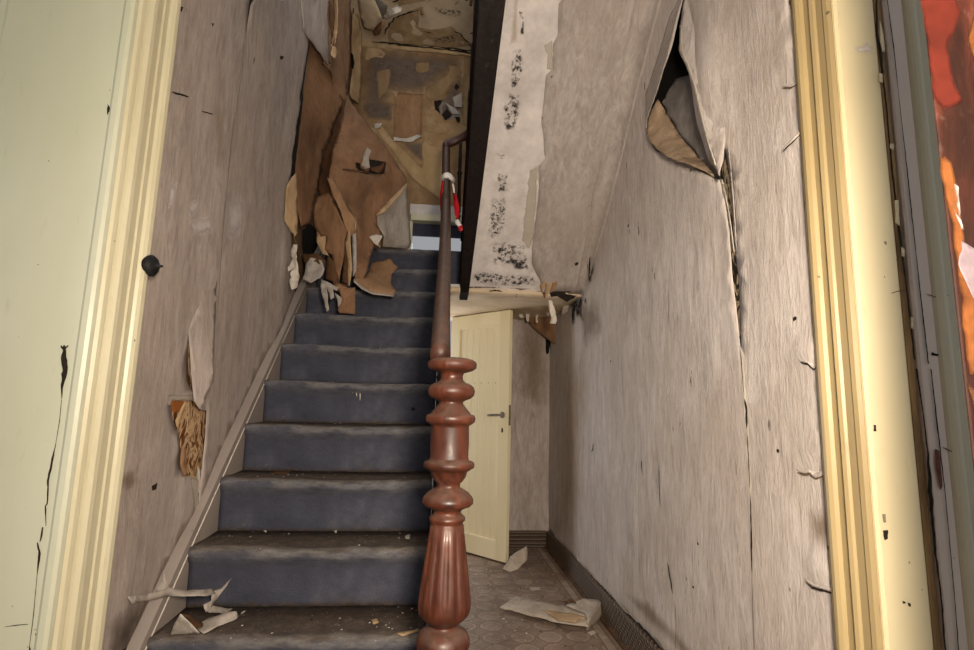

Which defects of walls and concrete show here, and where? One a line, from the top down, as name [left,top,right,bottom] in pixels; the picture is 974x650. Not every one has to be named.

peeling [358,0,471,126]
damp [505,51,522,130]
peeling [921,0,961,106]
peeling [377,126,442,199]
spalling [302,224,318,265]
damp [475,175,534,286]
peeling [941,159,974,373]
crack [6,345,68,650]
crack [740,351,754,638]